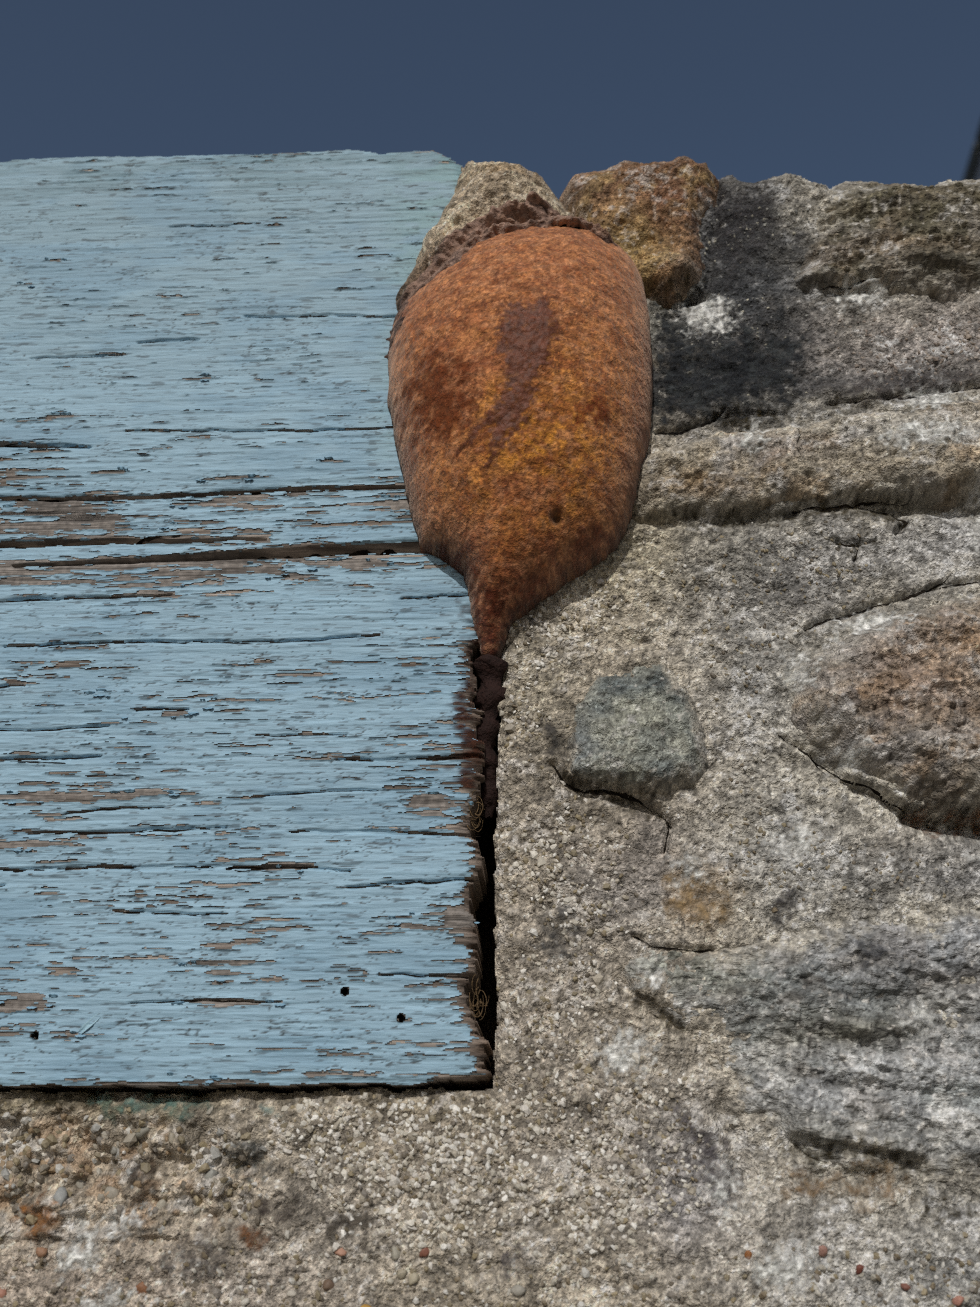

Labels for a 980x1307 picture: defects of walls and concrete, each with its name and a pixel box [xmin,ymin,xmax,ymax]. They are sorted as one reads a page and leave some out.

rust [396,296,560,468]
leakage [652,303,813,424]
peeling [0,473,409,596]
crack [805,573,980,631]
peeling [121,694,260,723]
peeling [0,787,189,806]
peeling [400,788,474,817]
crack [553,765,672,853]
crack [778,735,904,814]
peeling [260,861,317,876]
peeling [168,957,285,1008]
peeling [120,1072,229,1087]